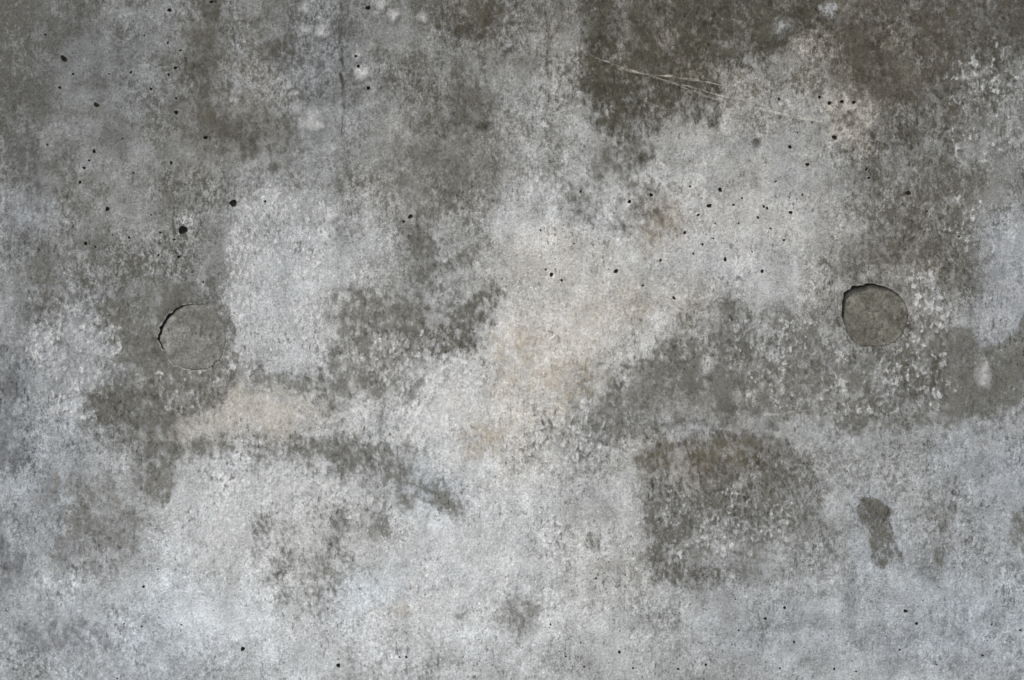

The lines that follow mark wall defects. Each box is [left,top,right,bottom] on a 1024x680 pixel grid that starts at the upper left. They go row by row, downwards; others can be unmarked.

leakage [36,54,503,578]
leakage [527,284,1024,589]